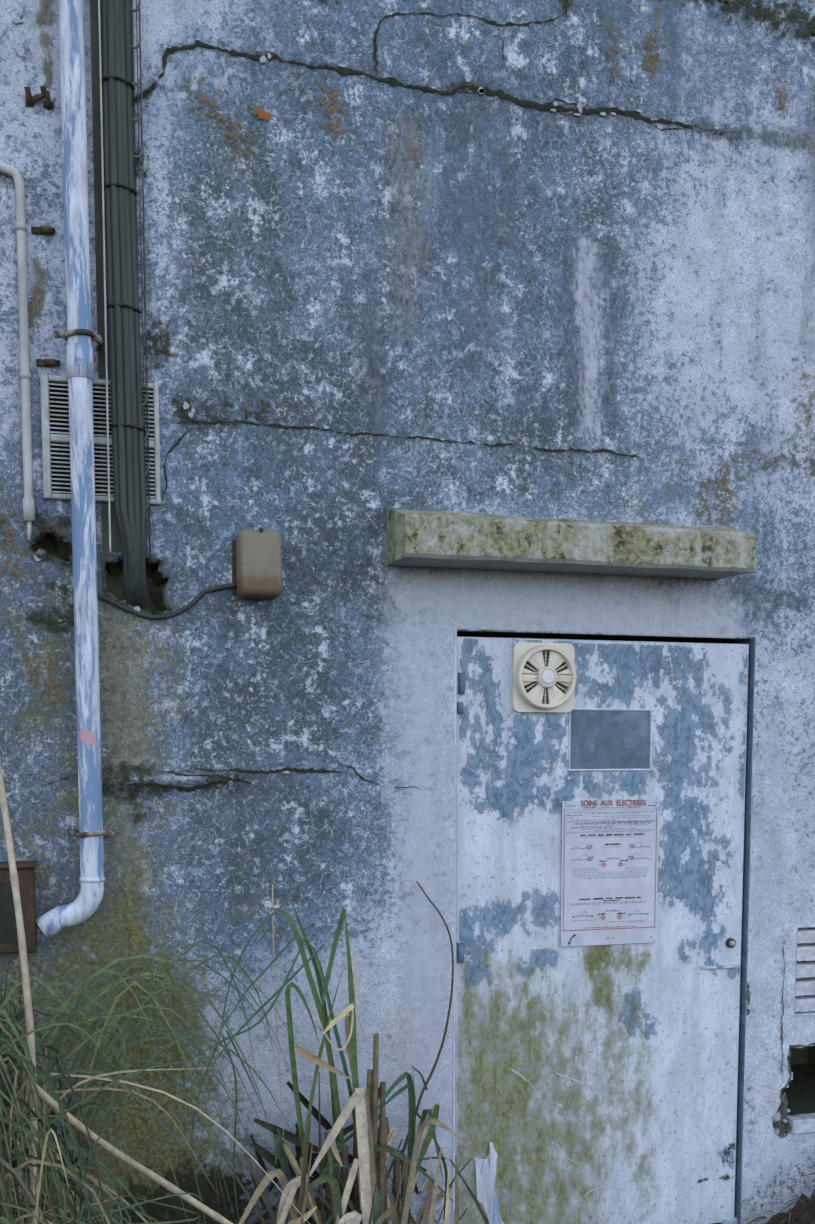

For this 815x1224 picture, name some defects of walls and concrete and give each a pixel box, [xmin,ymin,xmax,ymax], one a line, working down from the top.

crack [134,0,741,135]
crack [159,417,641,502]
spalling [27,527,73,566]
spalling [101,553,173,615]
crack [45,763,419,792]
peeling [377,566,753,1121]
spalling [772,1043,815,1138]